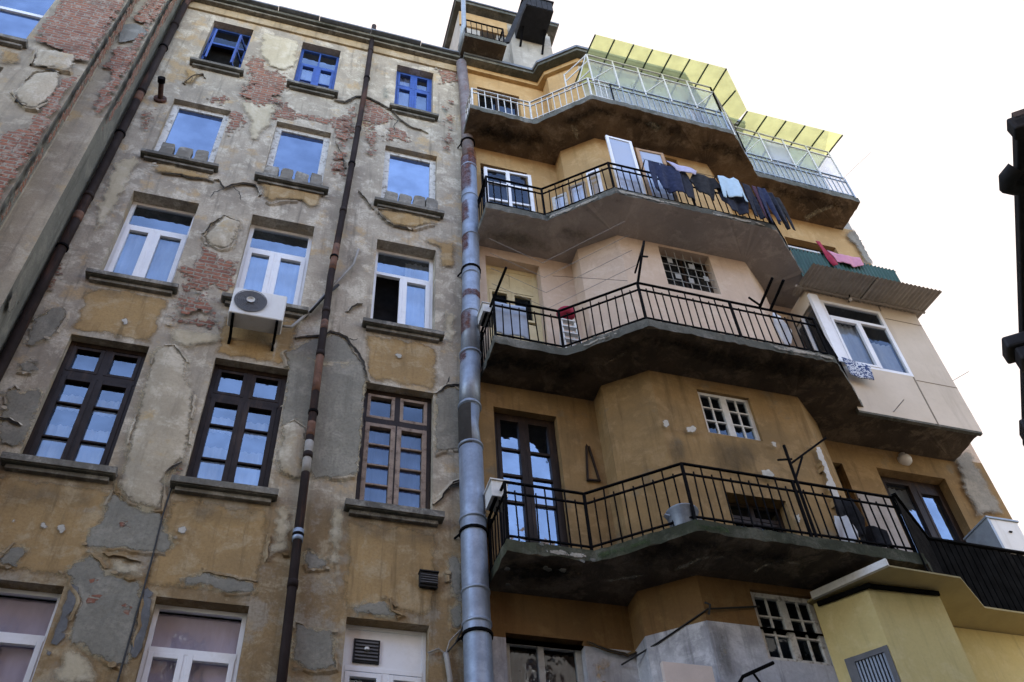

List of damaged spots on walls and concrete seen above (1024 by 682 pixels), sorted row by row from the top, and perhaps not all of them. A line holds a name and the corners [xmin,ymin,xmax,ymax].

flaking render [0,0,177,222]
flaking render [206,56,411,178]
crack [334,96,428,134]
crack [162,172,262,233]
crack [358,190,413,231]
flaking render [166,246,239,329]
peeling [0,358,43,446]
peeling [280,334,368,482]
spalling [809,444,839,535]
peeling [957,452,1002,515]
peeling [58,489,186,671]
peeling [180,567,256,598]